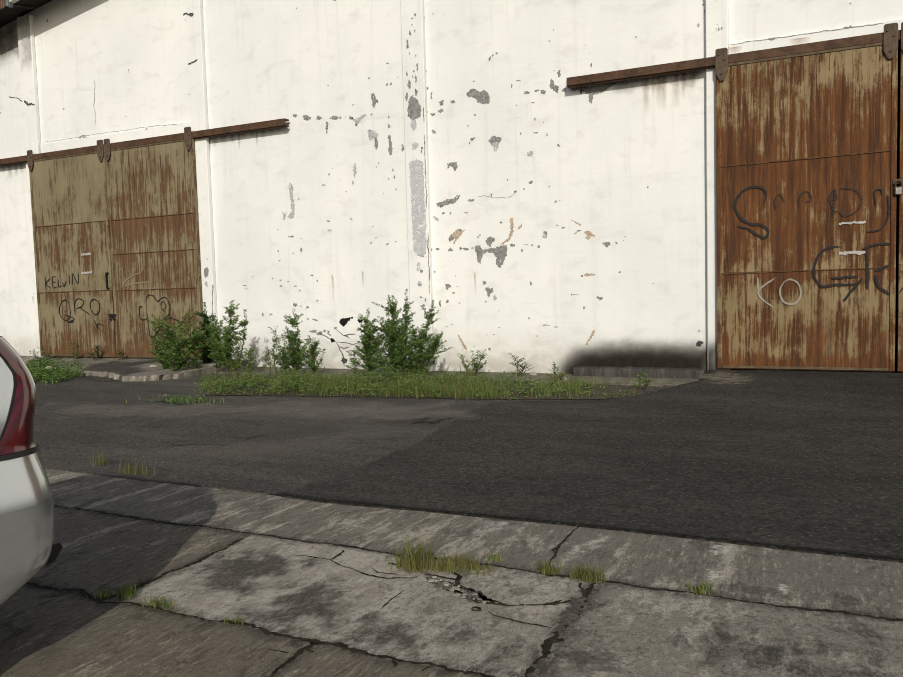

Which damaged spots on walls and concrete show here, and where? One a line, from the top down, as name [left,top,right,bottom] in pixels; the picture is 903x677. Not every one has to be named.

peeling [293,93,378,134]
peeling [386,13,455,131]
peeling [466,80,490,104]
peeling [524,70,617,103]
peeling [367,116,547,307]
crack [26,505,903,677]